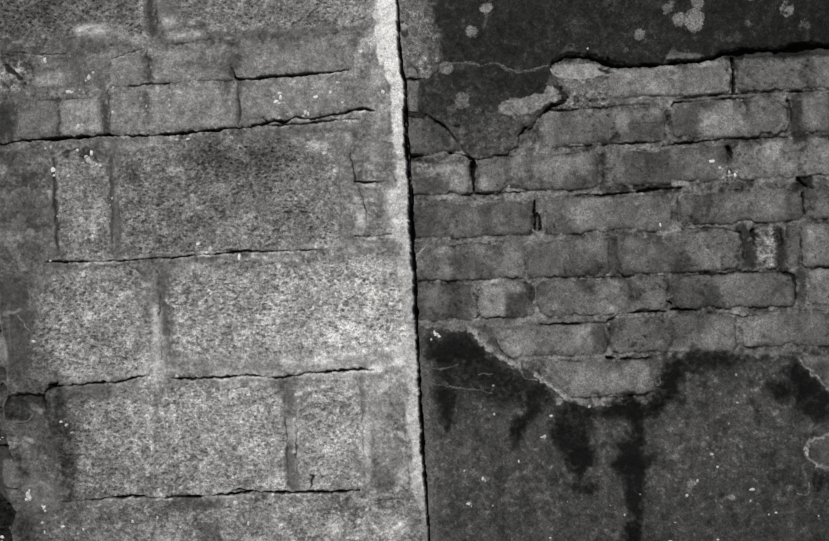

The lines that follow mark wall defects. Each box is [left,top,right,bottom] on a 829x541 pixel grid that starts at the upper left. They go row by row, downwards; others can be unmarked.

crack [408,112,474,160]
spalling [407,41,829,408]
leakage [770,359,829,421]
leakage [551,346,732,541]
spalling [806,434,829,471]